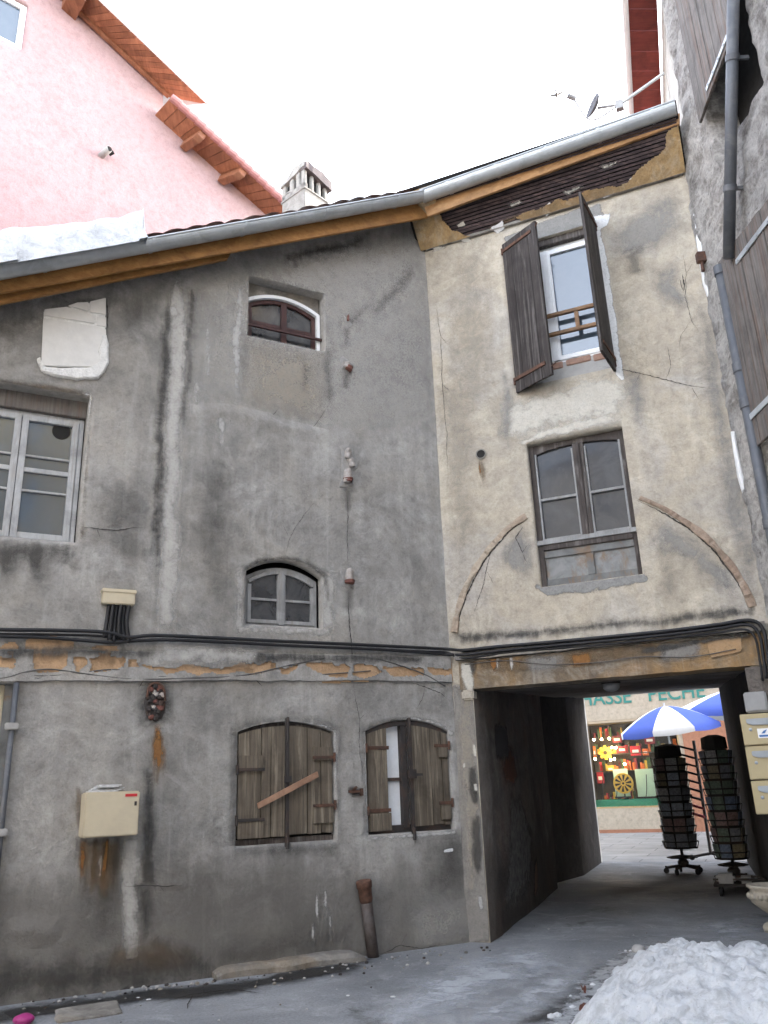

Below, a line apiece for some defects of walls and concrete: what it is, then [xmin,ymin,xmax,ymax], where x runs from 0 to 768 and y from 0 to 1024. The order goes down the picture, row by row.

leakage [232,290,242,388]
crack [622,255,705,396]
leakage [153,284,199,625]
crack [459,519,527,621]
rust [153,727,164,768]
peeling [0,636,481,878]
leakage [0,772,358,1022]